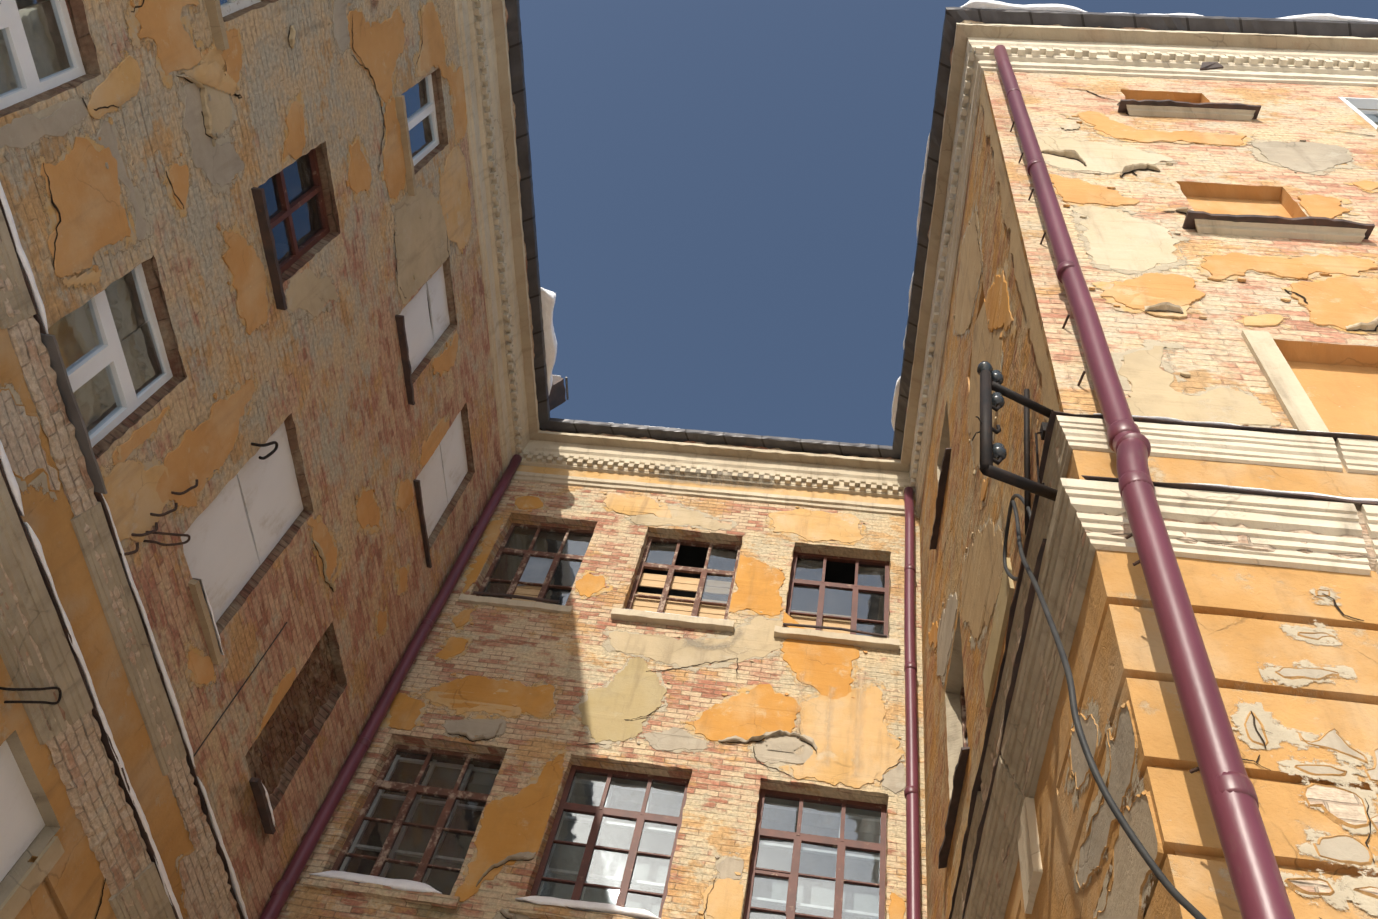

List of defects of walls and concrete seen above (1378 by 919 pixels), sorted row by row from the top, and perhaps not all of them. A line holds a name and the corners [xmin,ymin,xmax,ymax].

peeling [0,0,244,290]
peeling [216,218,340,335]
peeling [1035,111,1378,335]
peeling [99,373,258,551]
peeling [459,493,549,595]
peeling [601,492,739,531]
peeling [765,506,868,545]
peeling [379,553,906,796]
spalling [1257,586,1357,688]
peeling [454,747,570,903]
spalling [1064,697,1164,919]
spalling [1230,702,1378,916]